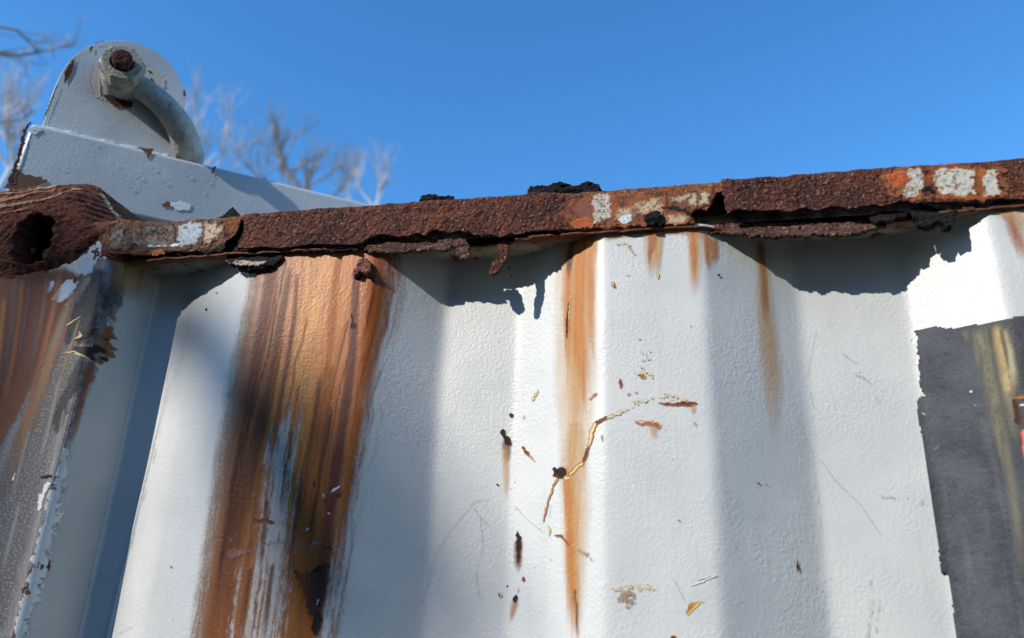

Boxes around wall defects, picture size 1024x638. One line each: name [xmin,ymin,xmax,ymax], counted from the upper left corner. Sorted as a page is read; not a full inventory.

rust [0,185,80,215]
peeling [48,200,226,305]
rust [219,207,244,226]
rust [419,194,454,202]
rust [527,181,602,194]
rust [608,203,988,381]
rust [1002,211,1024,246]
rust [0,269,85,461]
rust [192,237,471,638]
rust [565,237,595,627]
crack [543,406,633,535]
peeling [13,448,71,638]